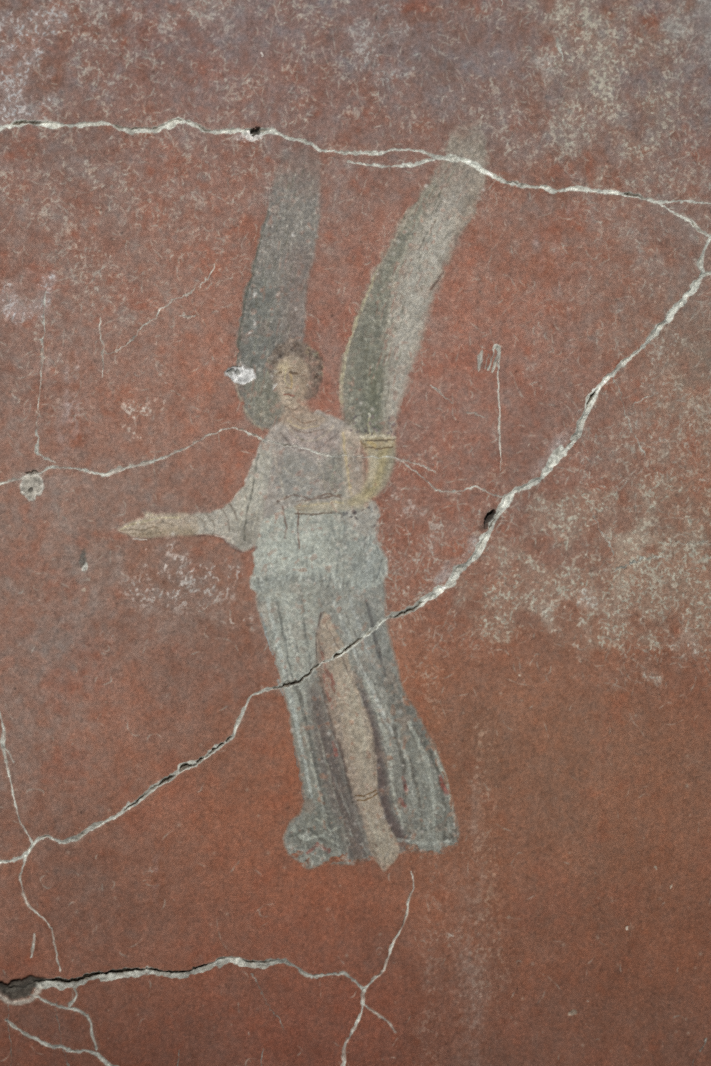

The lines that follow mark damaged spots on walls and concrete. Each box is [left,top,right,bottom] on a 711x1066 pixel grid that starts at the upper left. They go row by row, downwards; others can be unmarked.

spalling [224,361,257,385]
crack [0,110,711,873]
crack [0,866,419,1066]